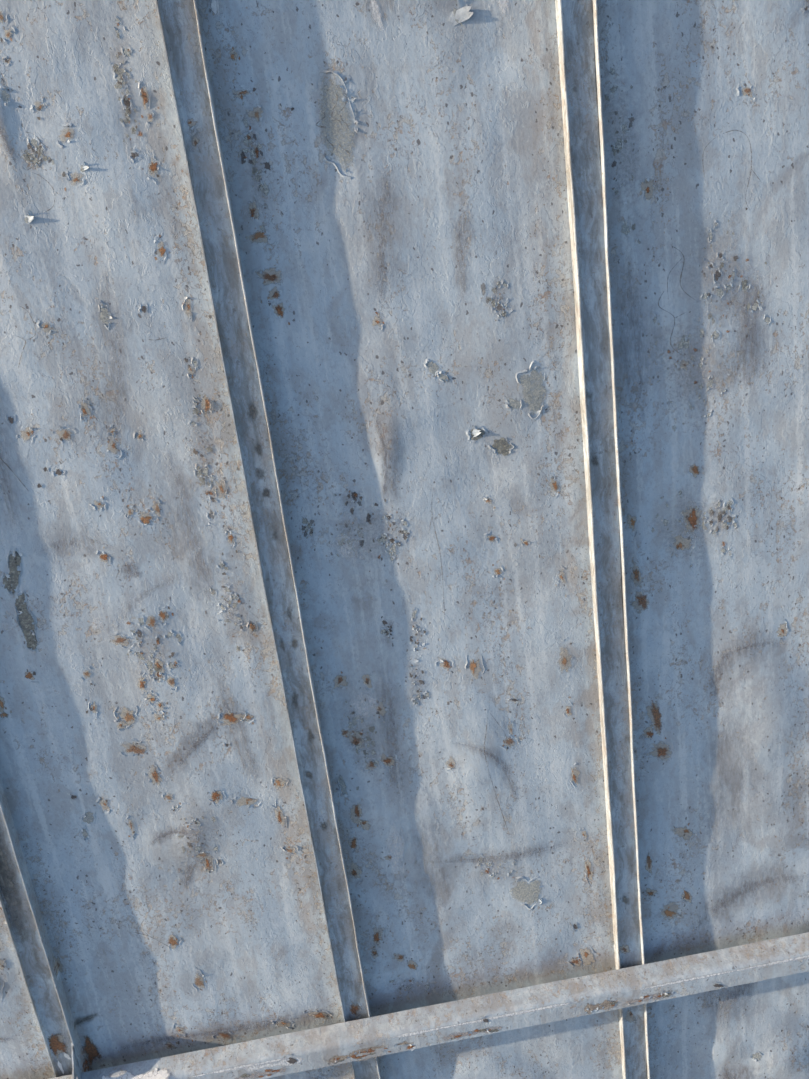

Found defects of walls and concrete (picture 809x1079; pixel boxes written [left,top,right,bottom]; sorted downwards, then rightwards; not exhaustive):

peeling [316,69,359,179]
peeling [22,135,51,168]
peeling [466,425,516,456]
rust [667,498,704,553]
peeling [1,548,39,654]
rust [144,604,174,633]
rust [113,632,136,653]
rust [113,653,190,756]
rust [217,709,255,725]
rust [338,724,401,773]
rust [144,763,173,803]
rust [48,1031,101,1072]